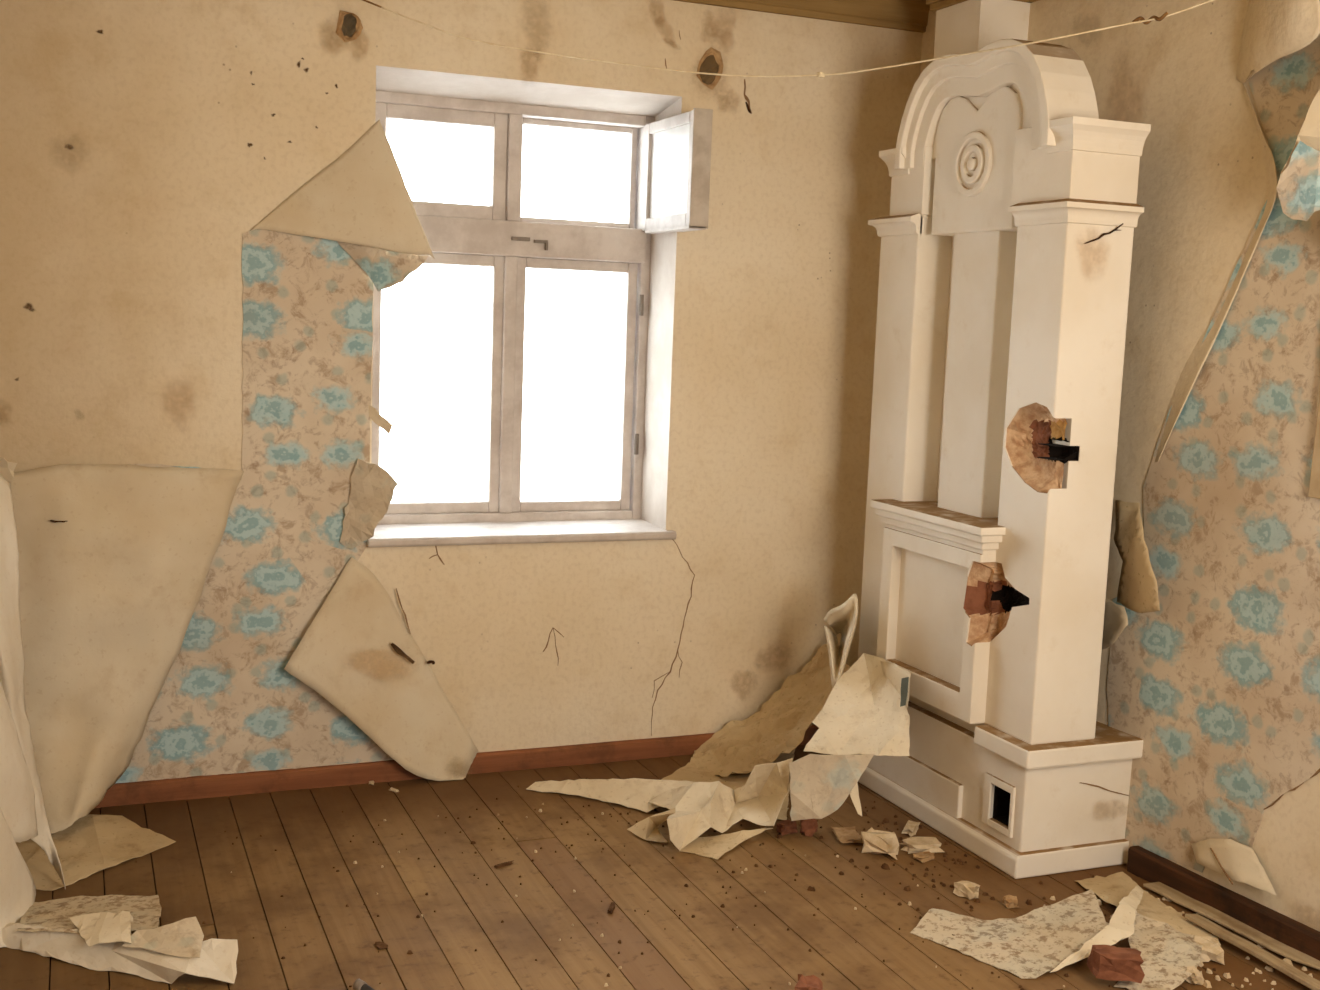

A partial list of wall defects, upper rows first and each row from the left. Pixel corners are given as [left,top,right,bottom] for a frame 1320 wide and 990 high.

crack [1085,223,1123,244]
spalling [1006,402,1079,493]
crack [651,539,695,736]
spalling [963,561,1029,645]
spalling [1087,945,1145,983]